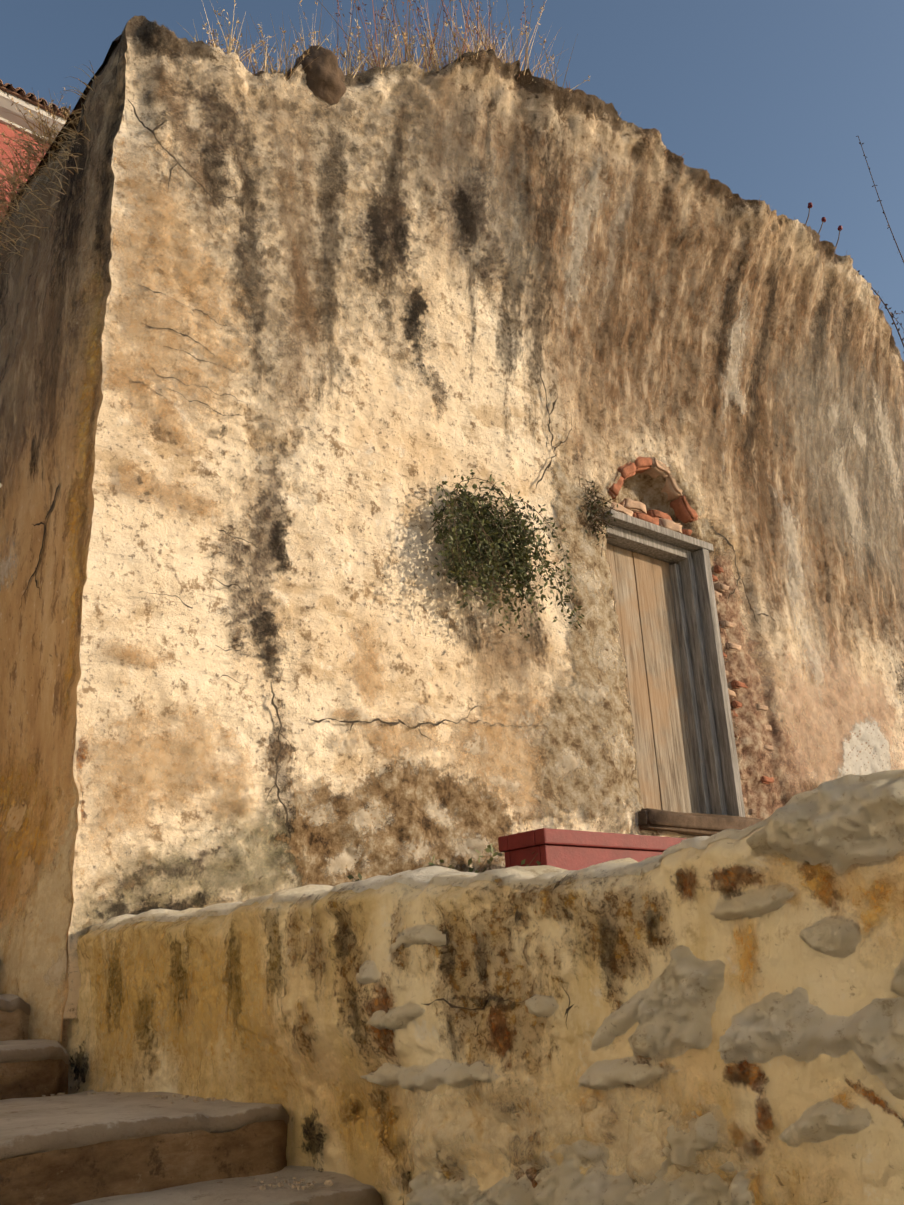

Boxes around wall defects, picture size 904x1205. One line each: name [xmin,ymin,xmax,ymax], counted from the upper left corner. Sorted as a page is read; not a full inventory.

damp [0,21,904,793]
crack [139,529,257,684]
flaking render [266,448,817,886]
damp [80,698,297,847]
crack [265,683,547,874]